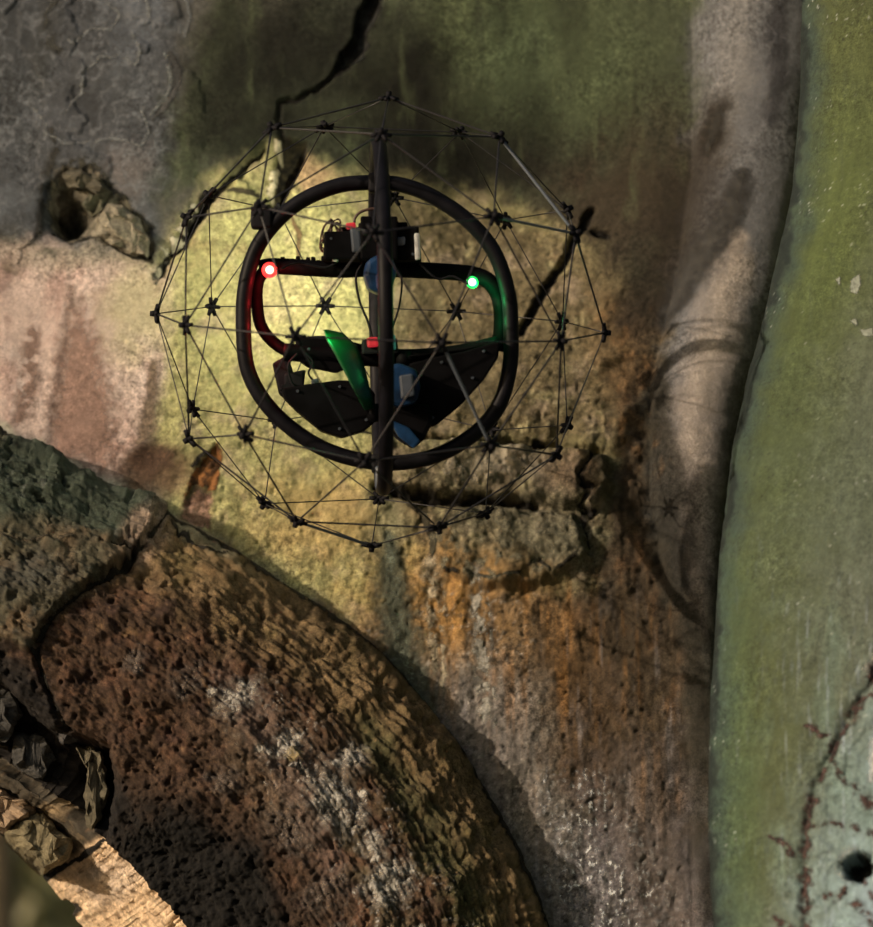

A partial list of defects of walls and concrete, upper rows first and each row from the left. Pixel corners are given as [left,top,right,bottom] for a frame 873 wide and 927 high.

crack [152,0,382,285]
spalling [48,156,154,263]
crack [519,207,593,337]
crack [373,481,537,558]
crack [480,439,546,450]
crack [576,451,600,550]
crack [30,510,421,731]
crack [451,733,550,927]